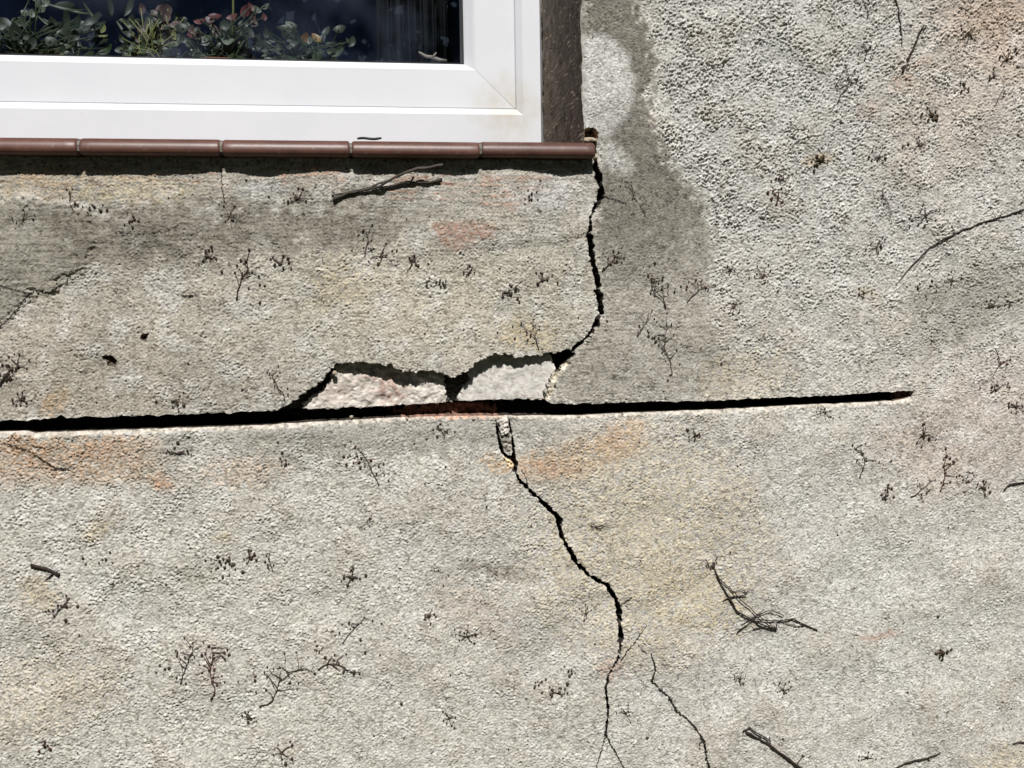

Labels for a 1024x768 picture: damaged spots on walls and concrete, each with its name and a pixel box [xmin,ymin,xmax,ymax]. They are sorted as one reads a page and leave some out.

crack [115,225,179,234]
crack [543,145,627,371]
crack [0,267,86,326]
spalling [281,352,570,418]
crack [3,442,74,470]
crack [495,419,710,768]